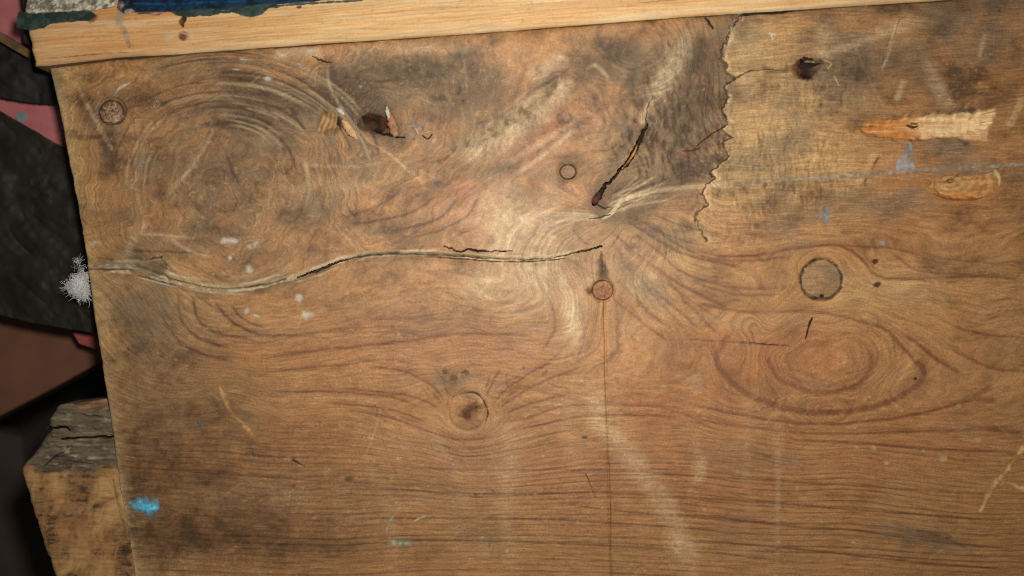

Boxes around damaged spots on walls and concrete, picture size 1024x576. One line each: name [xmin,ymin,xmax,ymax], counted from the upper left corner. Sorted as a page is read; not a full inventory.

crack [684,126,726,151]
spalling [860,109,995,141]
crack [590,102,650,219]
spalling [893,169,1002,202]
crack [88,245,601,292]